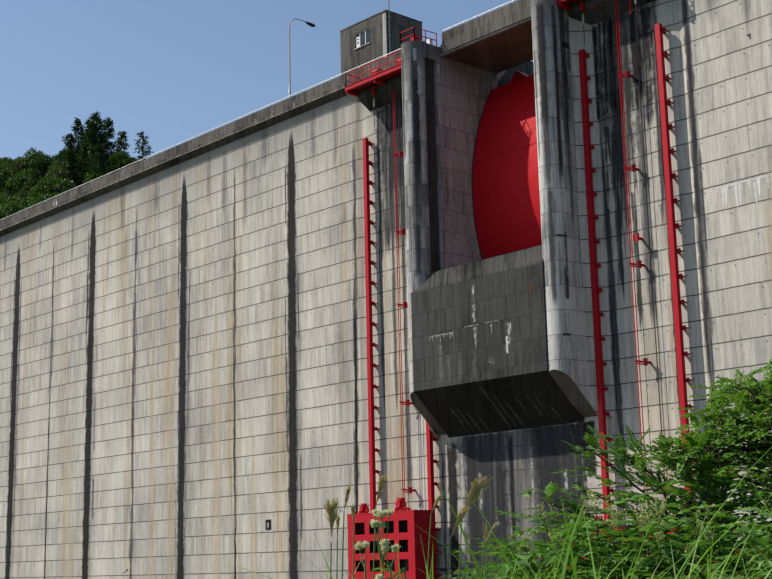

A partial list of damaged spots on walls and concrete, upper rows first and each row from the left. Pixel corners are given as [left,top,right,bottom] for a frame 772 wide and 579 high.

water stain [5,249,21,579]
water stain [82,213,96,579]
water stain [175,179,190,579]
water stain [285,137,302,579]
water stain [376,56,421,487]
water stain [592,2,666,446]
water stain [681,0,772,411]